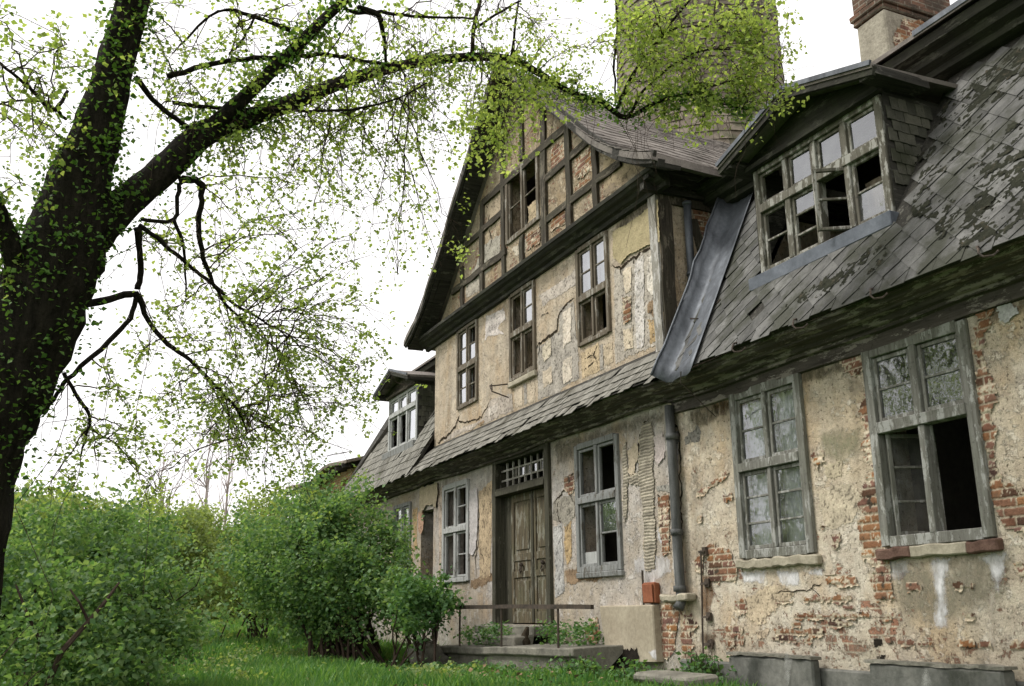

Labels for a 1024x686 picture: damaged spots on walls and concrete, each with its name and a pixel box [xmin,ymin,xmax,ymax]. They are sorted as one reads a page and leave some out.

crack [612,247,651,274]
peeling [443,249,656,442]
crack [536,298,573,354]
crack [438,403,489,444]
flaking render [653,425,701,470]
flaking render [971,303,1024,533]
flaking render [552,474,603,598]
flaking render [656,484,670,556]
flaking render [694,541,737,585]
flaking render [724,394,932,649]
leakage [889,554,1005,626]
flaking render [658,601,698,664]